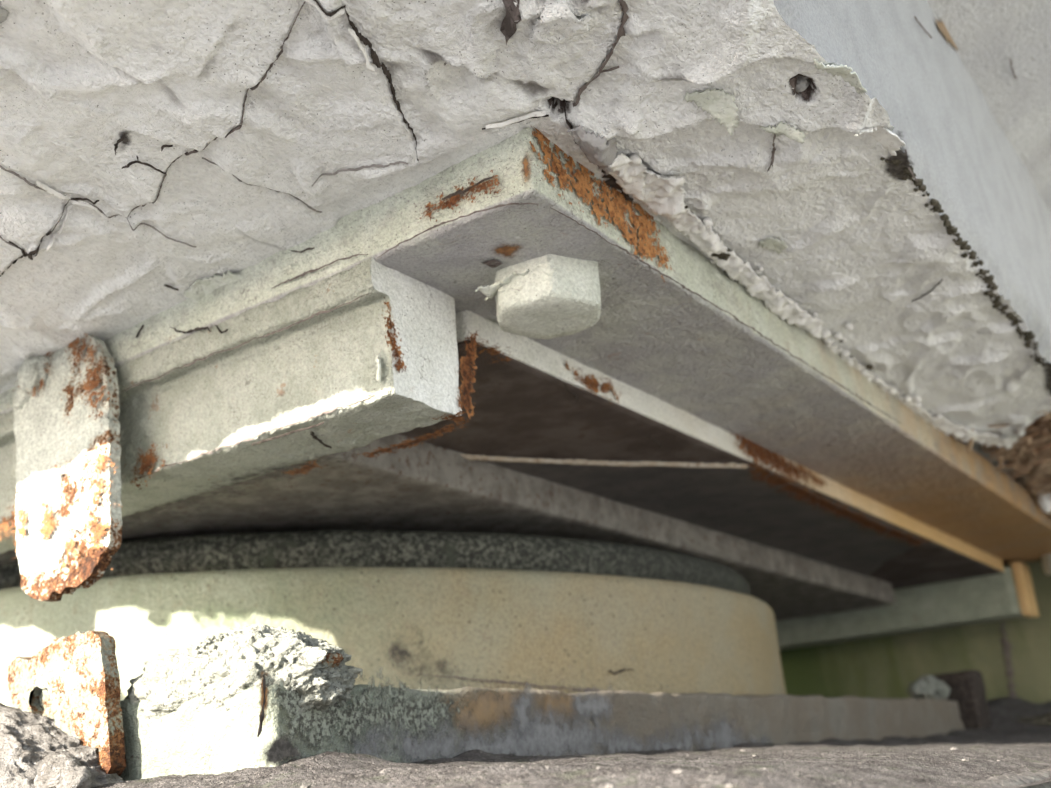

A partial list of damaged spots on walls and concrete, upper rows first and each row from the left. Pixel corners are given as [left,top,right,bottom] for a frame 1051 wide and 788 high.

spalling [0,6,10,24]
crack [500,0,522,45]
crack [573,0,629,107]
crack [0,0,419,277]
flaking render [684,88,740,136]
peeling [854,126,906,156]
corrosion [415,170,501,224]
corrosion [522,126,672,282]
crack [272,247,369,289]
spalling [608,152,1015,449]
corrosion [362,331,526,458]
corrosion [38,689,54,719]